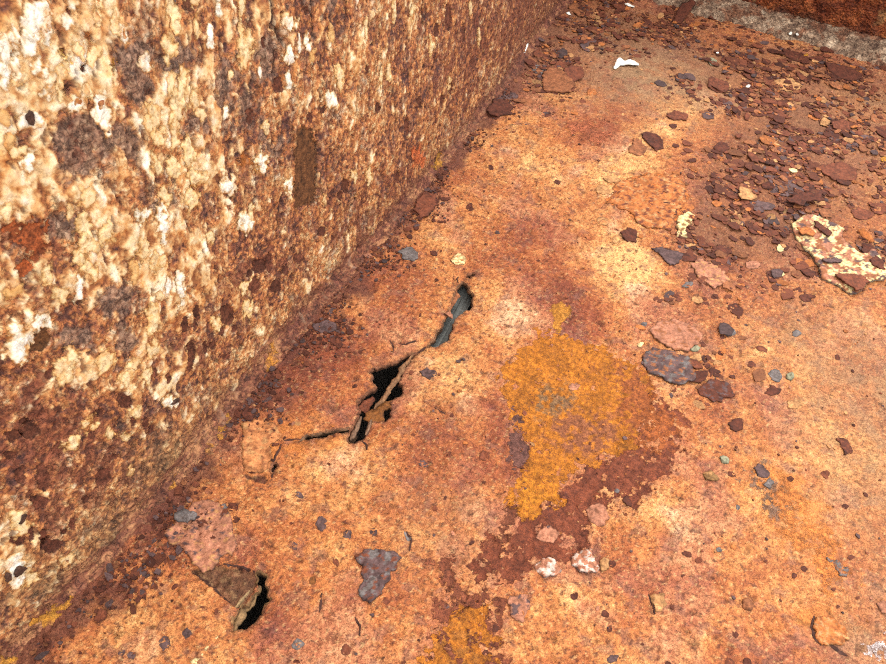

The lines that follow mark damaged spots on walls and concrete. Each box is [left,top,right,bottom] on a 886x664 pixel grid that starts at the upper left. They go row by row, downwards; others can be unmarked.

rust [666,110,688,128]
rust [701,57,769,121]
rust [603,173,695,244]
rust [651,244,732,266]
rust [800,256,870,291]
rust [851,202,886,270]
crack [269,272,475,478]
rust [690,341,735,403]
rust [764,369,782,396]
rust [416,301,692,664]
rust [354,548,402,605]
rust [703,459,866,646]